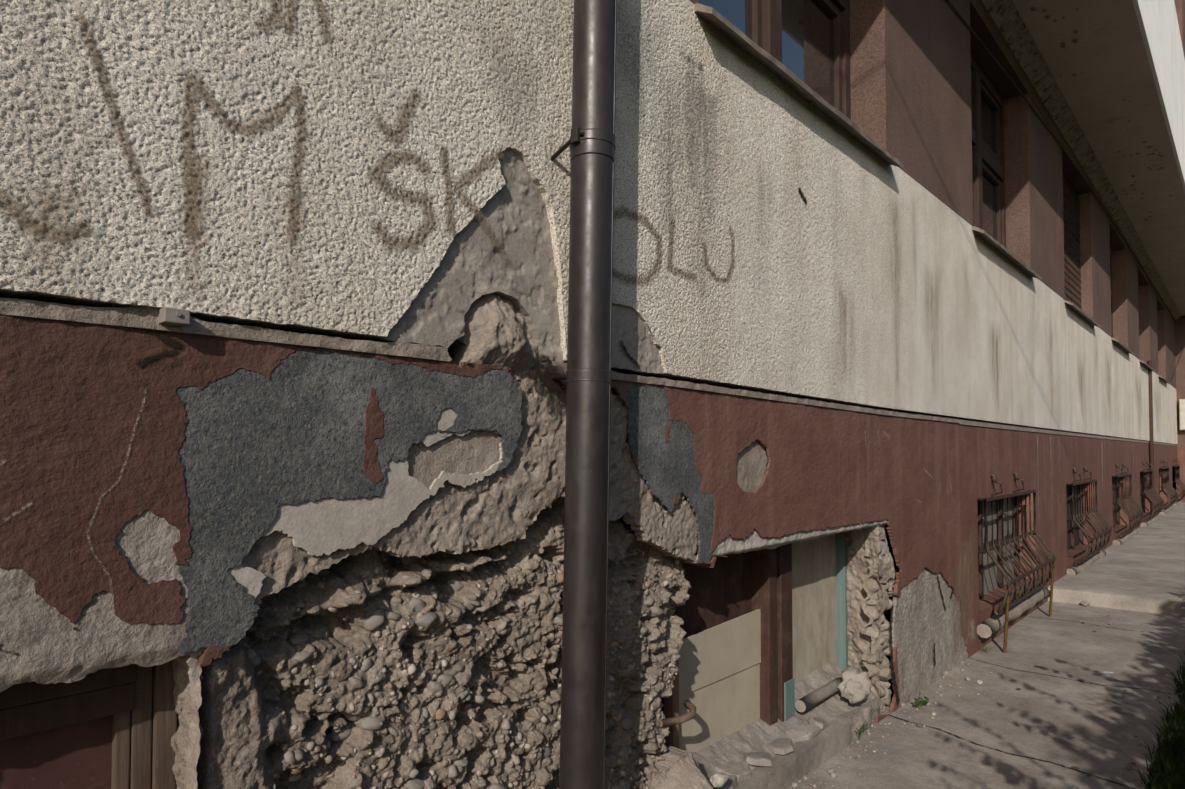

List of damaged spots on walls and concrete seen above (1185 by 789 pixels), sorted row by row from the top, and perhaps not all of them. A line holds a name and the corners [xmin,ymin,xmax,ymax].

spalling [0,345,567,789]
spalling [604,384,982,789]